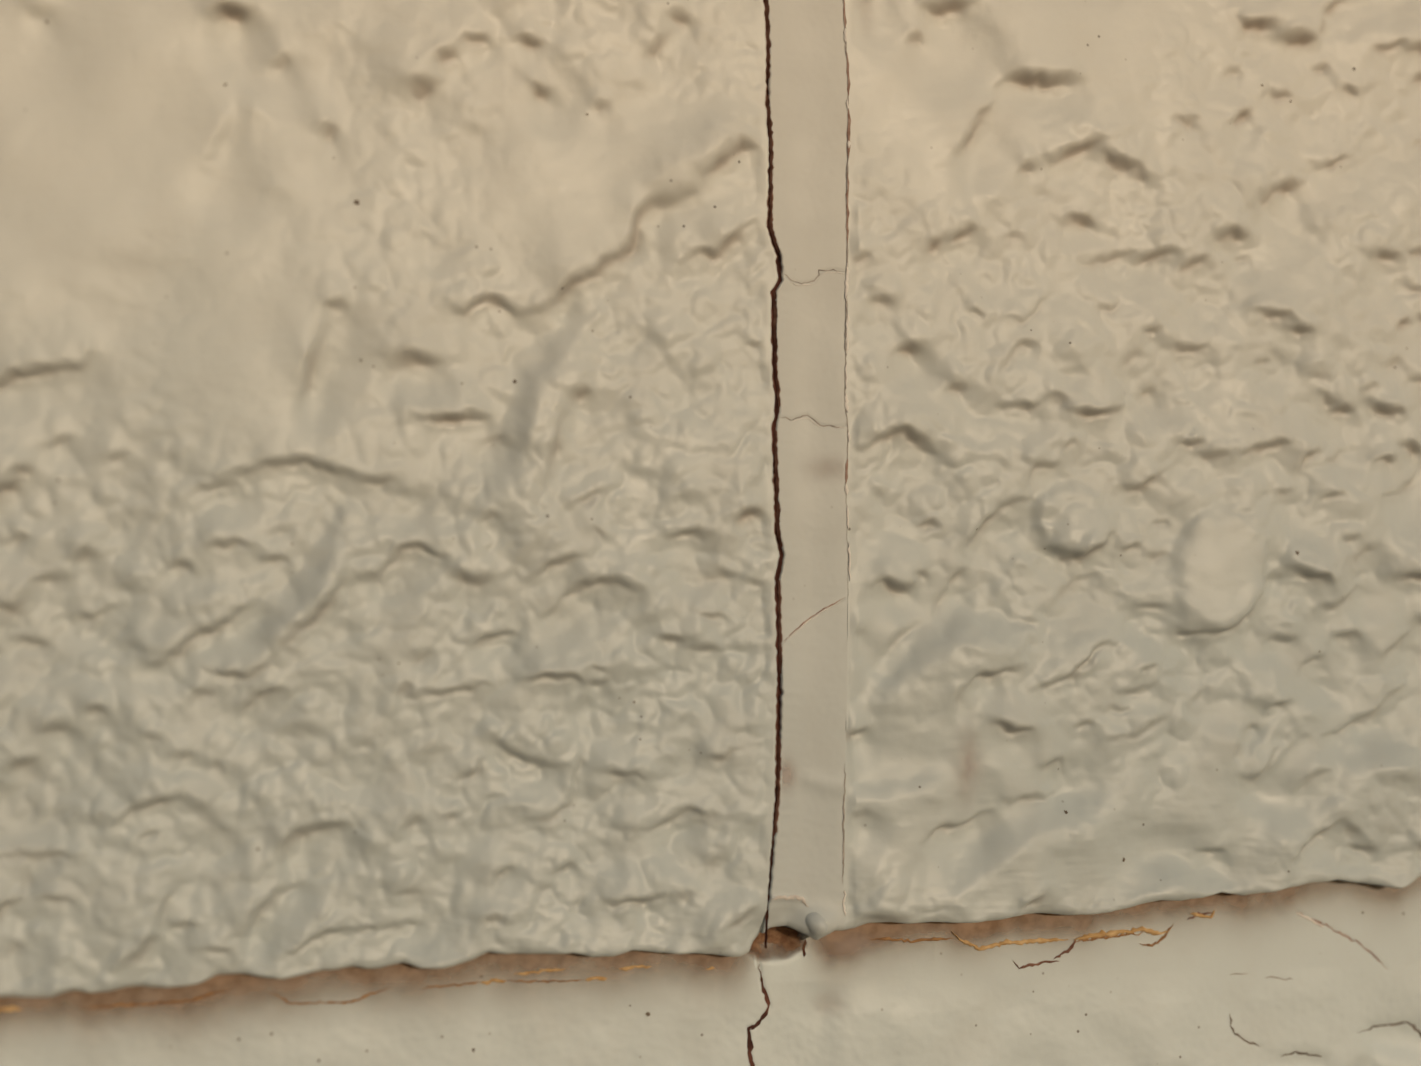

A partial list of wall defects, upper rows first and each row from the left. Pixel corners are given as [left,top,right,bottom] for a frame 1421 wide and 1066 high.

crack [747,0,851,1066]
crack [1296,911,1387,969]
crack [1357,1021,1421,1036]